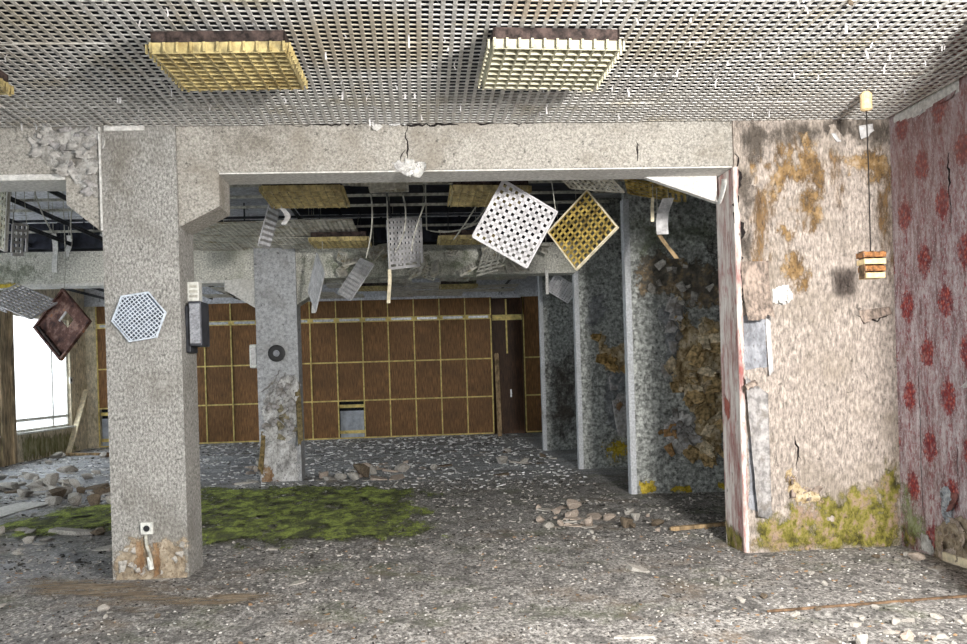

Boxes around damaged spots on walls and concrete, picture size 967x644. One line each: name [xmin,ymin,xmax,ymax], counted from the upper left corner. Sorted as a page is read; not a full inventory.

peeling [27,121,105,198]
crack [287,121,537,161]
peeling [717,179,727,204]
damp [738,117,894,294]
peeling [258,370,303,482]
damp [546,346,576,437]
peeling [585,293,627,438]
peeling [631,248,730,468]
flaking render [112,535,190,580]
flaking render [920,486,967,568]